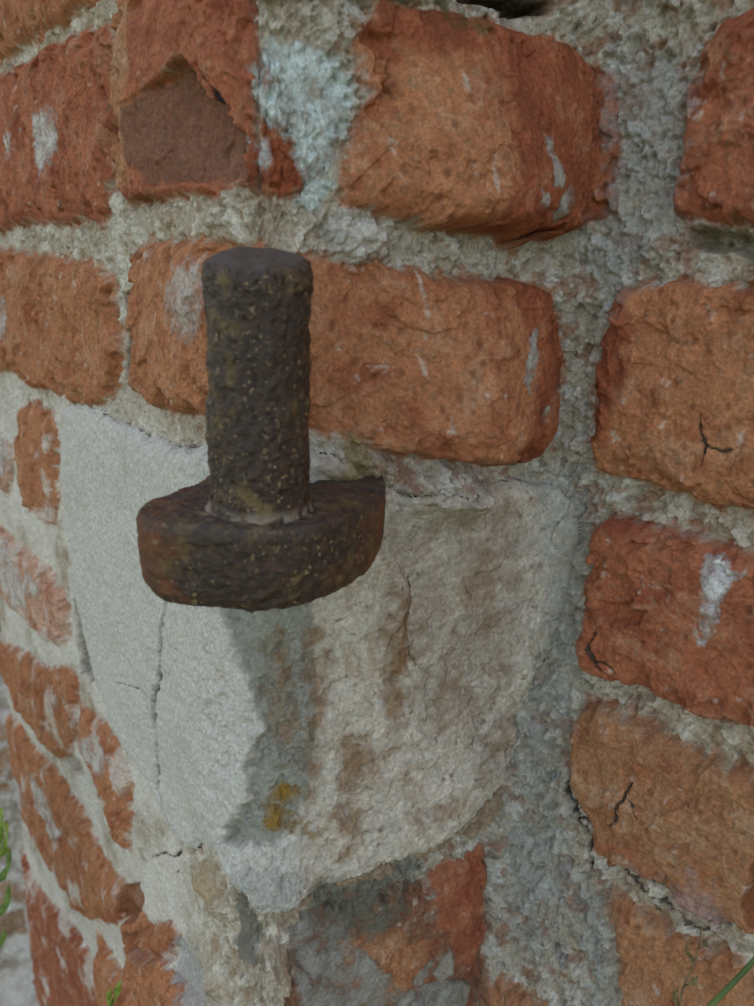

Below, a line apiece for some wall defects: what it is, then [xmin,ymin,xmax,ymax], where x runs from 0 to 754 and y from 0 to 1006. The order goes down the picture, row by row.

crack [387,575,417,665]